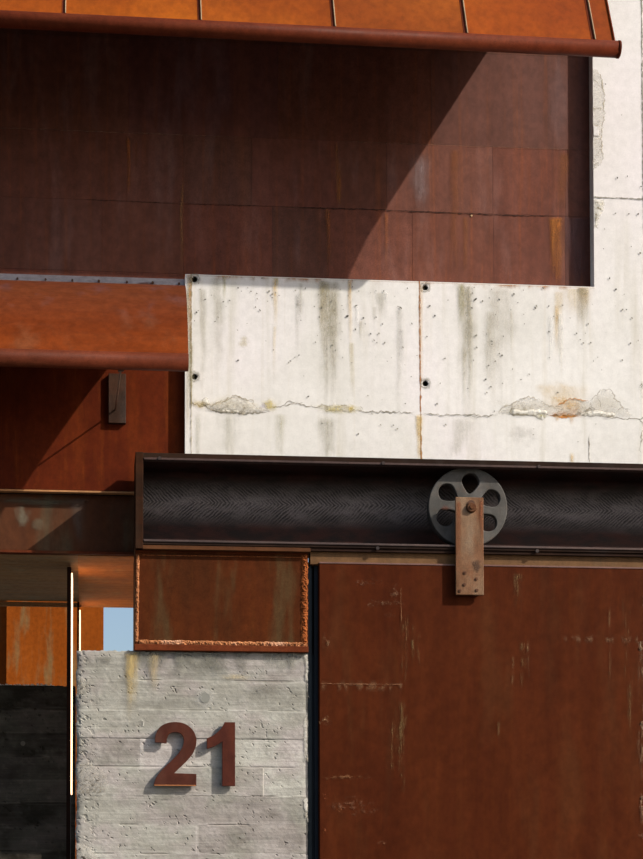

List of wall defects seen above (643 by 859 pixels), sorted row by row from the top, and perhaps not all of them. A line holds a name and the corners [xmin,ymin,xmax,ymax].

spalling [202,395,272,415]
crack [357,406,493,418]
spalling [499,389,628,420]